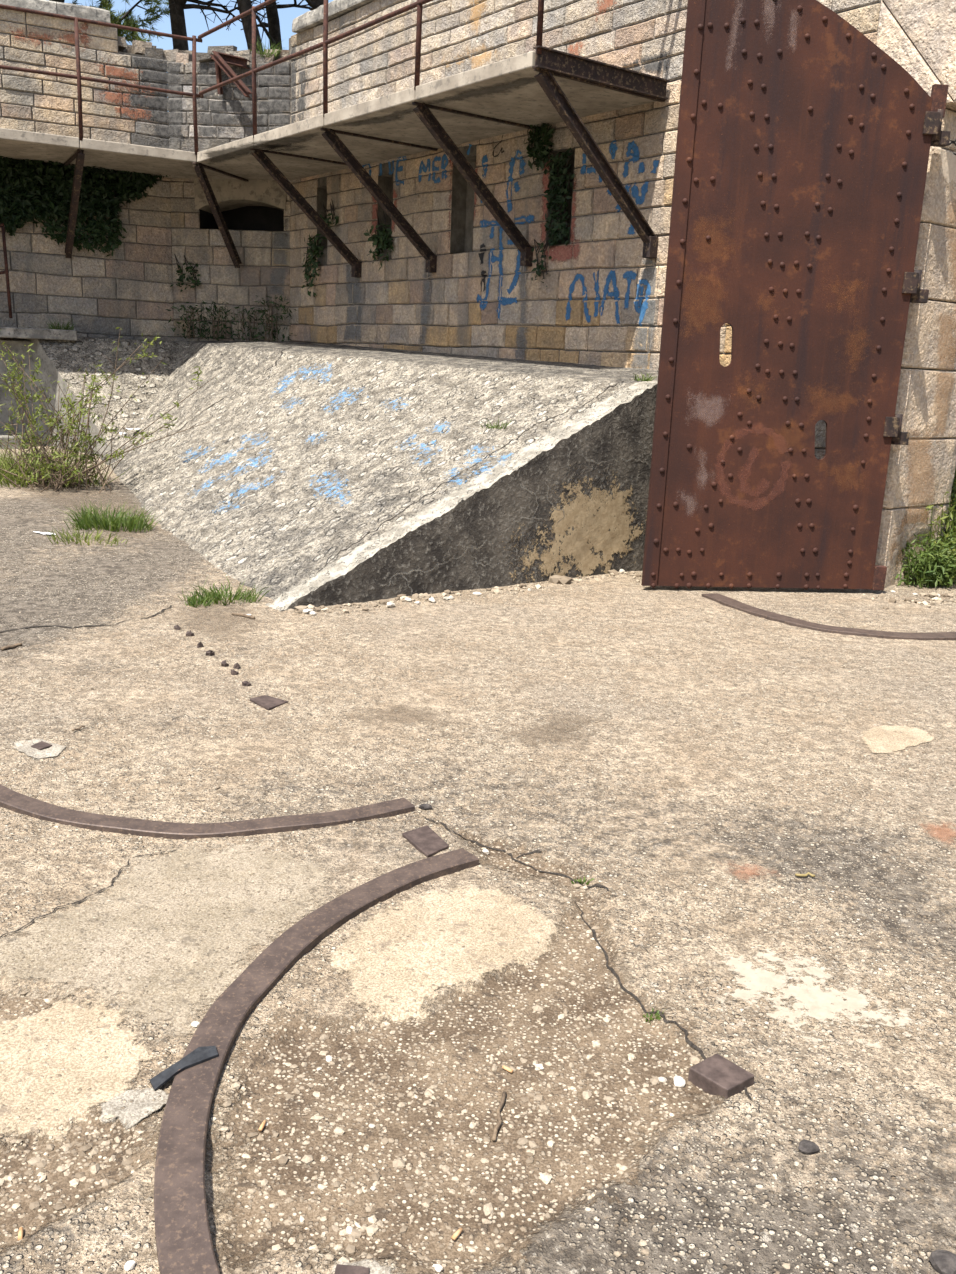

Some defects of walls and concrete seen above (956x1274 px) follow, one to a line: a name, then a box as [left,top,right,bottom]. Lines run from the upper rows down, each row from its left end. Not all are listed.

corrosion [99,59,154,120]
peeling [502,465,647,583]
crack [0,605,172,633]
crack [0,850,175,938]
crack [424,817,707,1060]